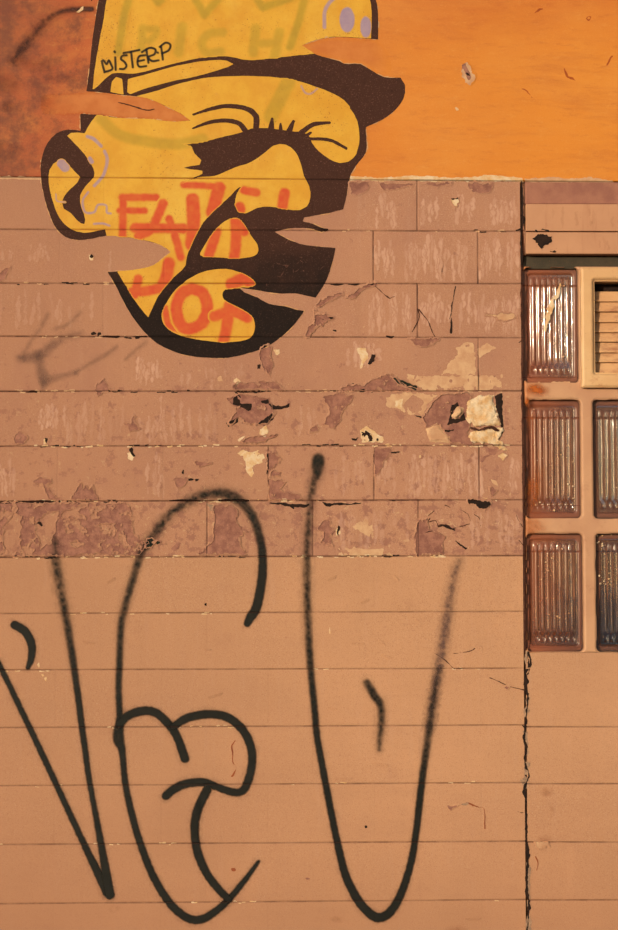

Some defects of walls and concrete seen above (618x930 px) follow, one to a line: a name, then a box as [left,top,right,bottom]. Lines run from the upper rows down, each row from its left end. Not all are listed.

peeling [532,229,556,253]
peeling [217,343,423,502]
flaking render [415,389,510,462]
peeling [0,476,184,560]
peeling [198,498,248,557]
peeling [317,518,377,558]
peeling [407,518,467,558]
peeling [466,479,499,512]
crack [474,181,538,930]